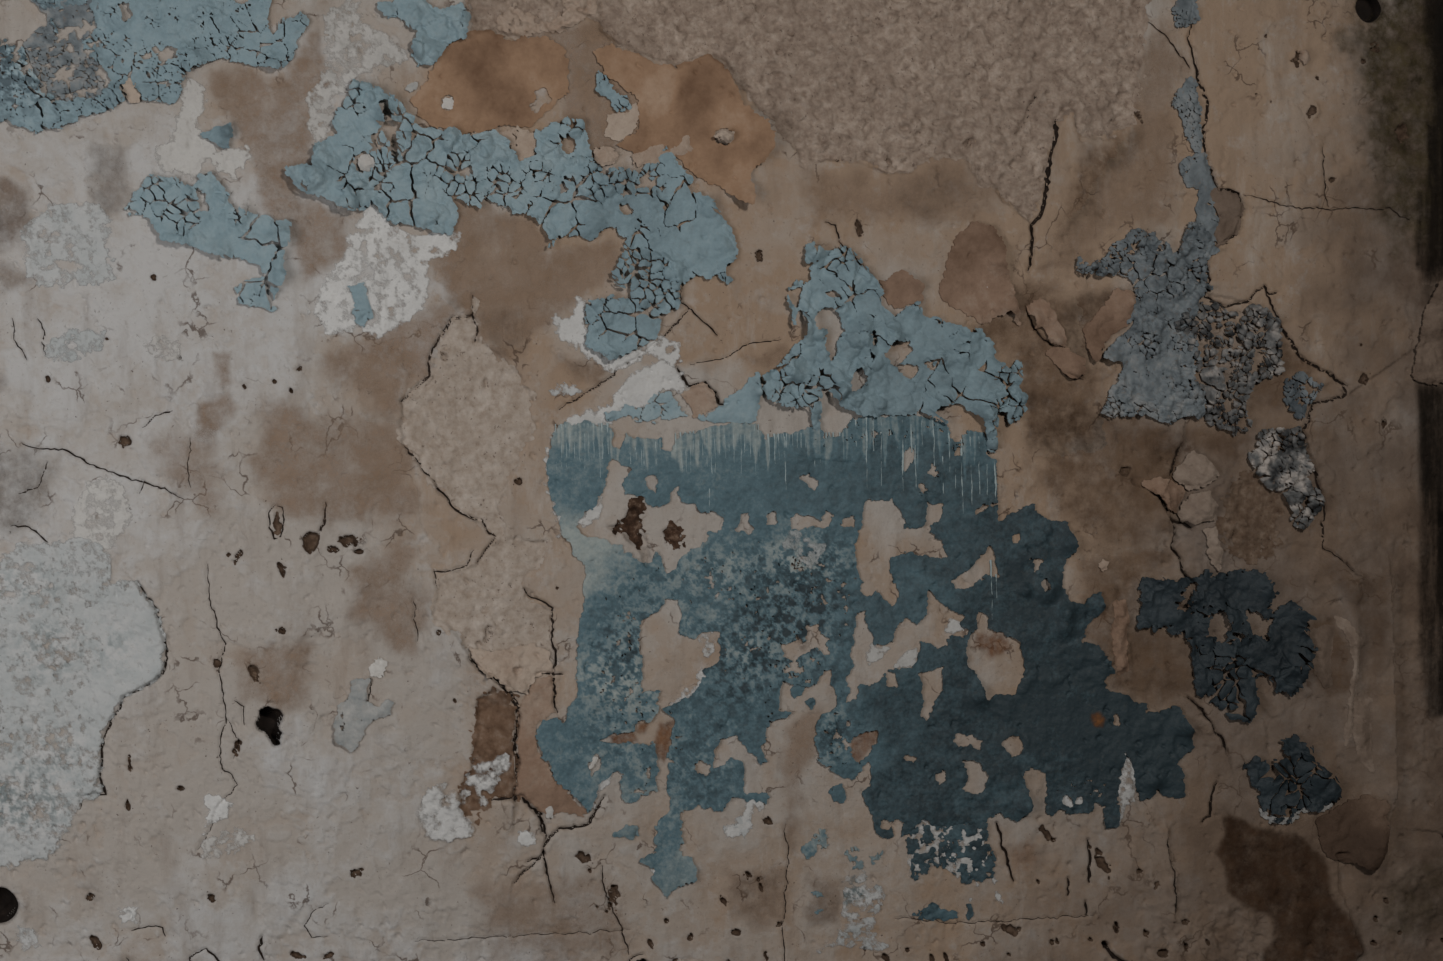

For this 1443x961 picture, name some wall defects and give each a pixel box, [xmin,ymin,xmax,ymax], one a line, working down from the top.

peeling [0,0,310,134]
peeling [124,171,292,312]
crack [401,295,479,402]
flaking render [284,0,1152,360]
crack [1026,310,1054,346]
crack [1021,91,1062,271]
crack [1149,22,1409,577]
crack [404,446,496,641]
peeling [396,76,1325,921]
flaking render [1243,734,1391,871]
damp [1218,817,1363,961]